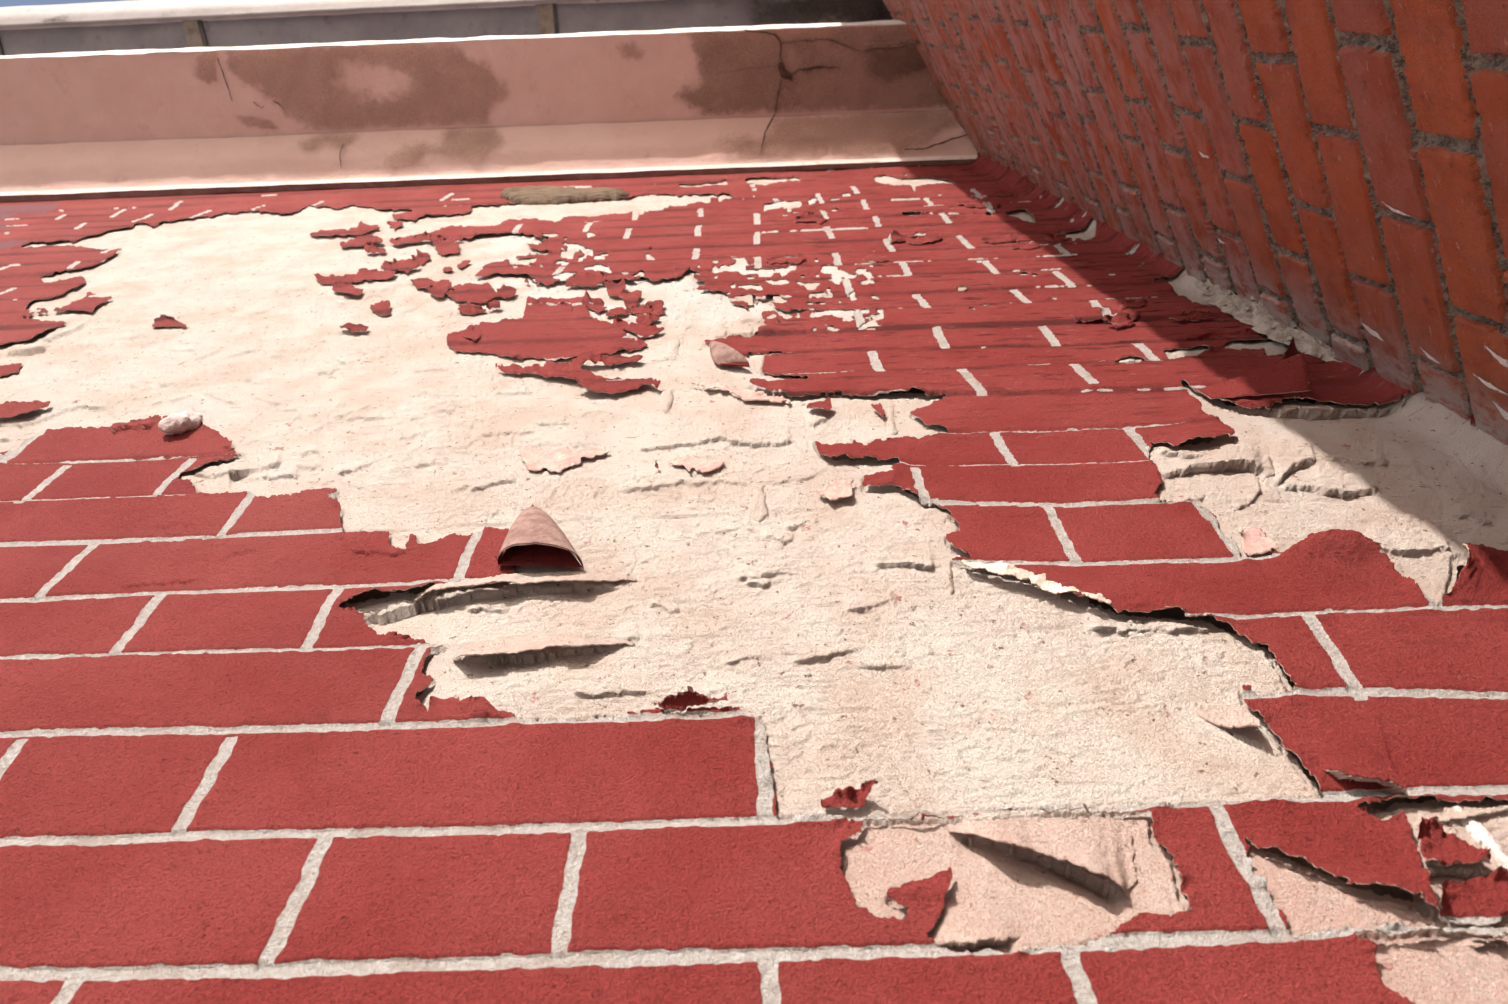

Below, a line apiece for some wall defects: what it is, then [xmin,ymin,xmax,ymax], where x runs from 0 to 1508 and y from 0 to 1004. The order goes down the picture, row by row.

water stain [197,43,503,164]
crack [719,29,908,155]
water stain [681,0,967,152]
peeling [1126,244,1508,606]
peeling [0,174,1323,954]
peeling [1245,799,1508,1004]